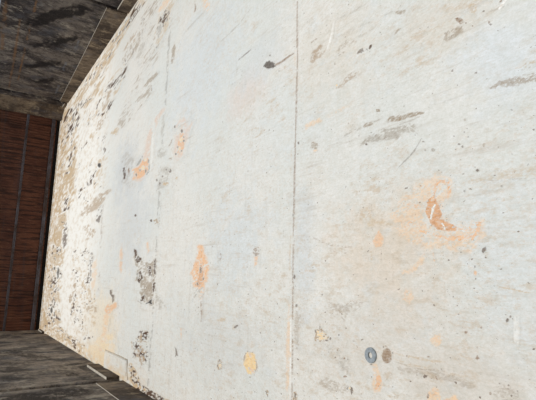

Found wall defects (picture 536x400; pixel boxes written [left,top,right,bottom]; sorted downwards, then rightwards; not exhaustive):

peeling [41,0,178,360]
corrosion [130,105,168,186]
corrosion [386,169,490,256]
corrosion [189,242,212,303]
peeling [128,329,171,400]